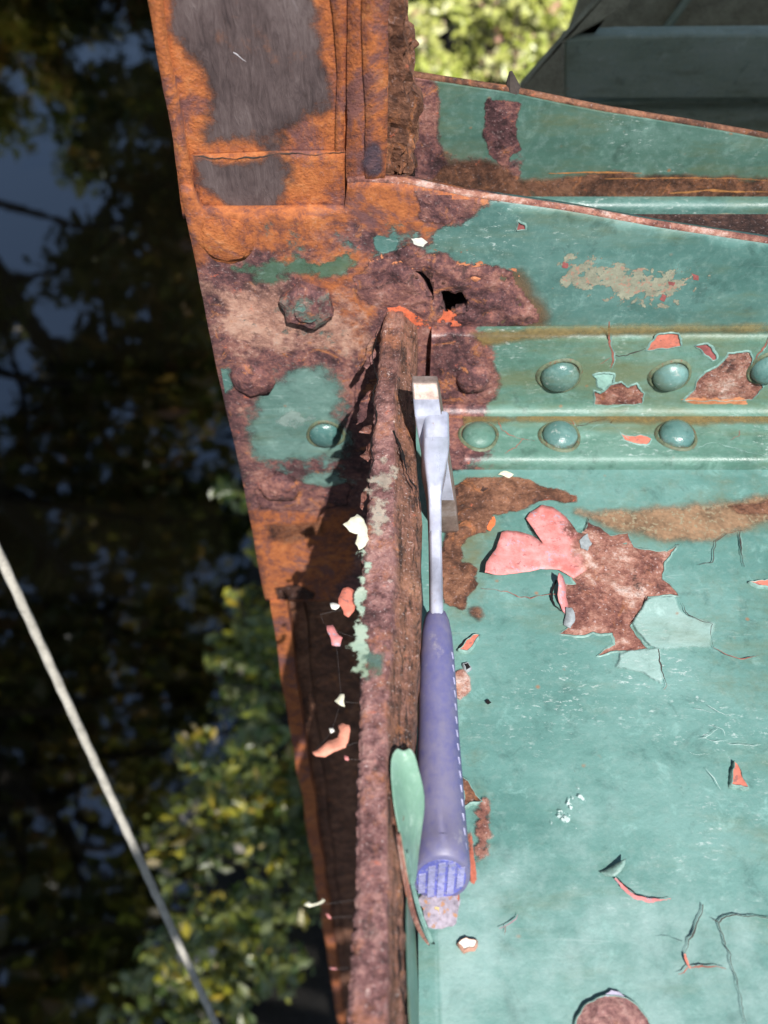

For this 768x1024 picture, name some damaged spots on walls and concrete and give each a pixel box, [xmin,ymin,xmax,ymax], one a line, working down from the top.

rust [363,143,382,176]
rust [415,81,768,225]
peeling [592,372,645,407]
peeling [645,332,765,405]
rust [353,238,768,620]
rust [255,471,369,541]
peeling [343,514,369,550]
rust [275,584,315,600]
peeling [327,625,343,646]
peeling [330,587,356,618]
peeling [482,505,715,681]
crack [662,904,768,1021]